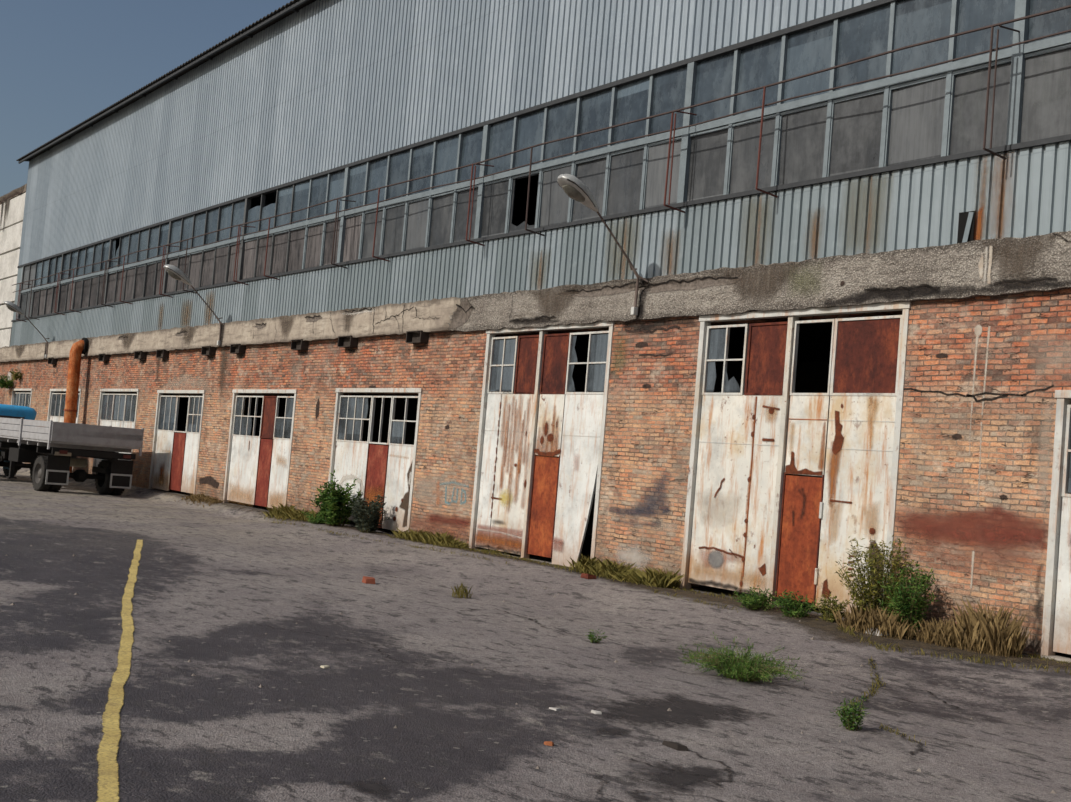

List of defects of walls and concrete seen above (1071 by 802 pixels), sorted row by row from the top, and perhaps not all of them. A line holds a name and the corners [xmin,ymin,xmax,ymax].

corrosion [974,208,982,240]
crack [904,385,1054,402]
corrosion [490,402,561,517]
corrosion [689,398,780,598]
corrosion [785,404,852,504]